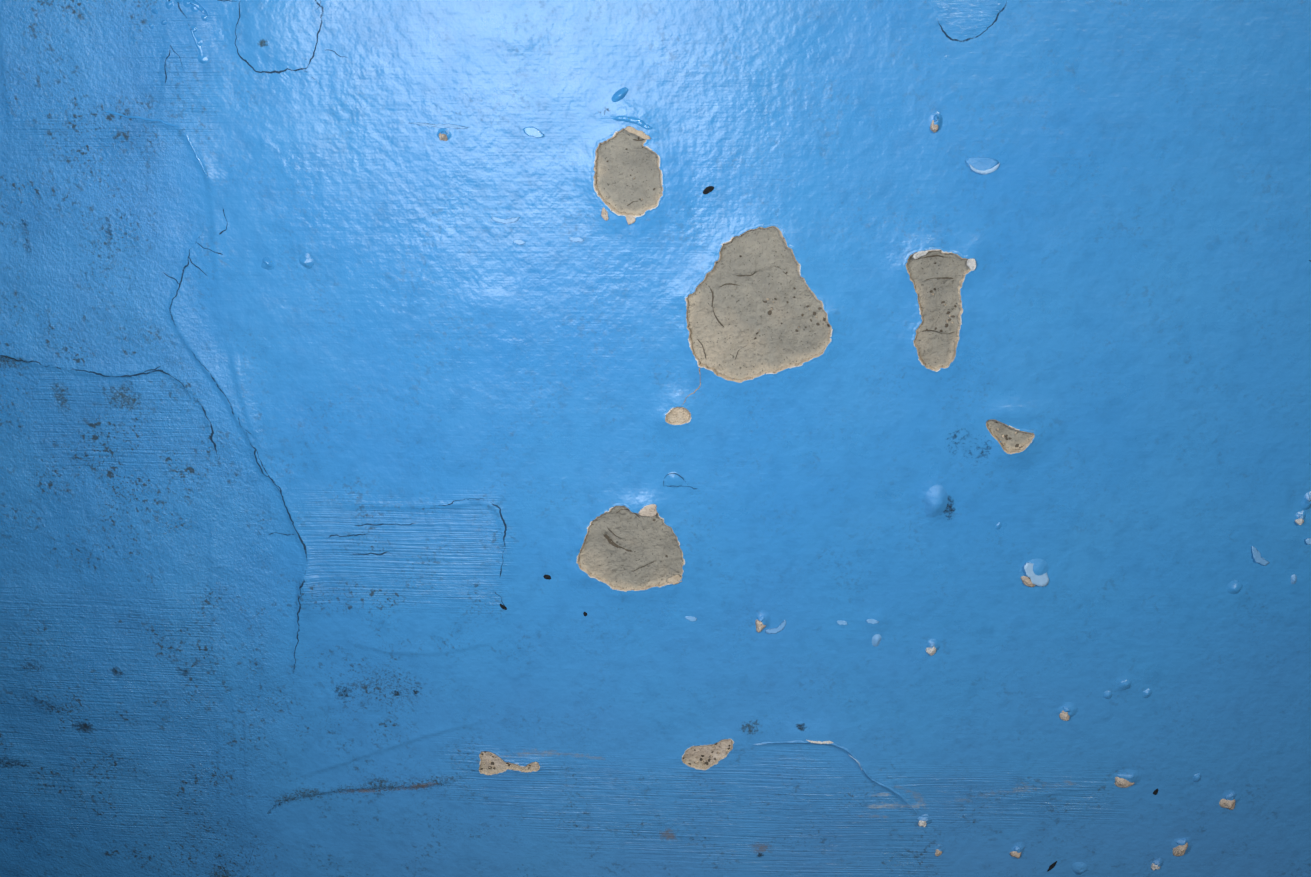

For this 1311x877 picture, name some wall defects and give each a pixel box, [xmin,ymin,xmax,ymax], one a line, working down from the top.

crack [218,0,347,74]
peeling [591,116,666,225]
crack [164,209,228,320]
peeling [683,223,835,385]
peeling [903,247,976,373]
peeling [983,417,1037,456]
crack [0,355,507,665]
peeling [575,503,687,593]
peeling [477,749,542,776]
peeling [680,737,736,771]